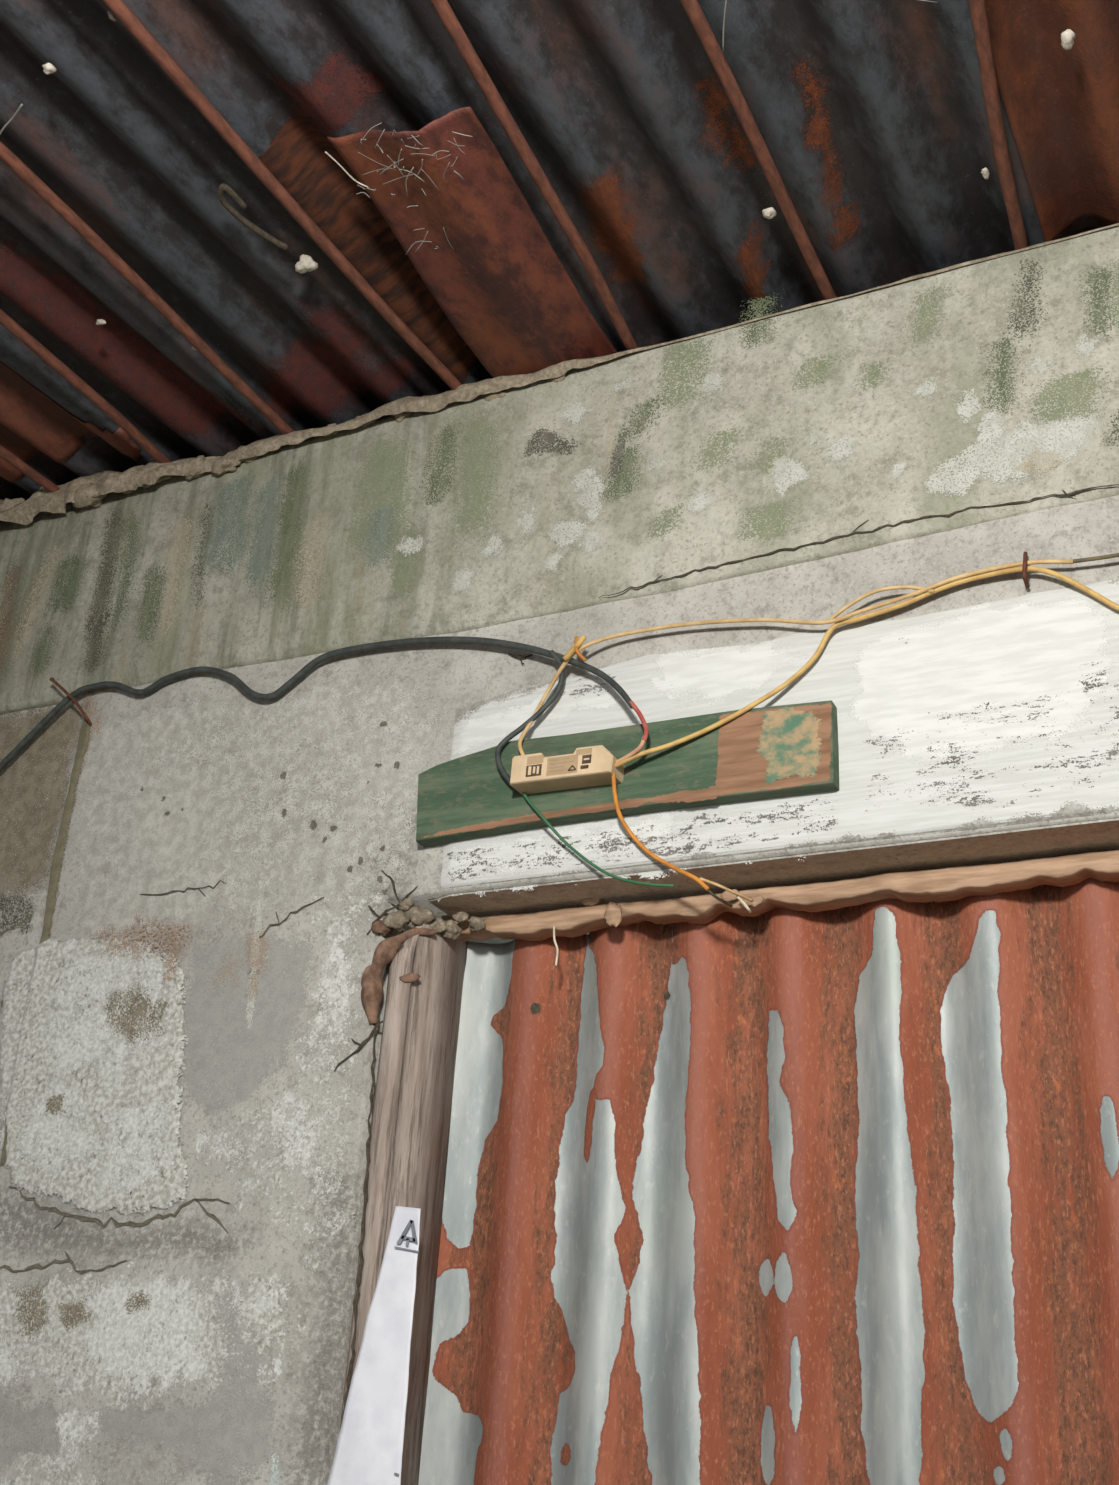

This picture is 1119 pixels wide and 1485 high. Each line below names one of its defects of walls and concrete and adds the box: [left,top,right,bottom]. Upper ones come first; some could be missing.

rust [259,116,477,382]
damp [737,294,782,349]
damp [790,349,892,391]
damp [903,283,954,348]
damp [955,257,1119,449]
damp [0,336,724,680]
damp [690,426,857,543]
crack [599,484,1119,598]
peeling [0,579,1119,1485]
crack [0,1186,230,1274]
rust [432,878,1119,1485]